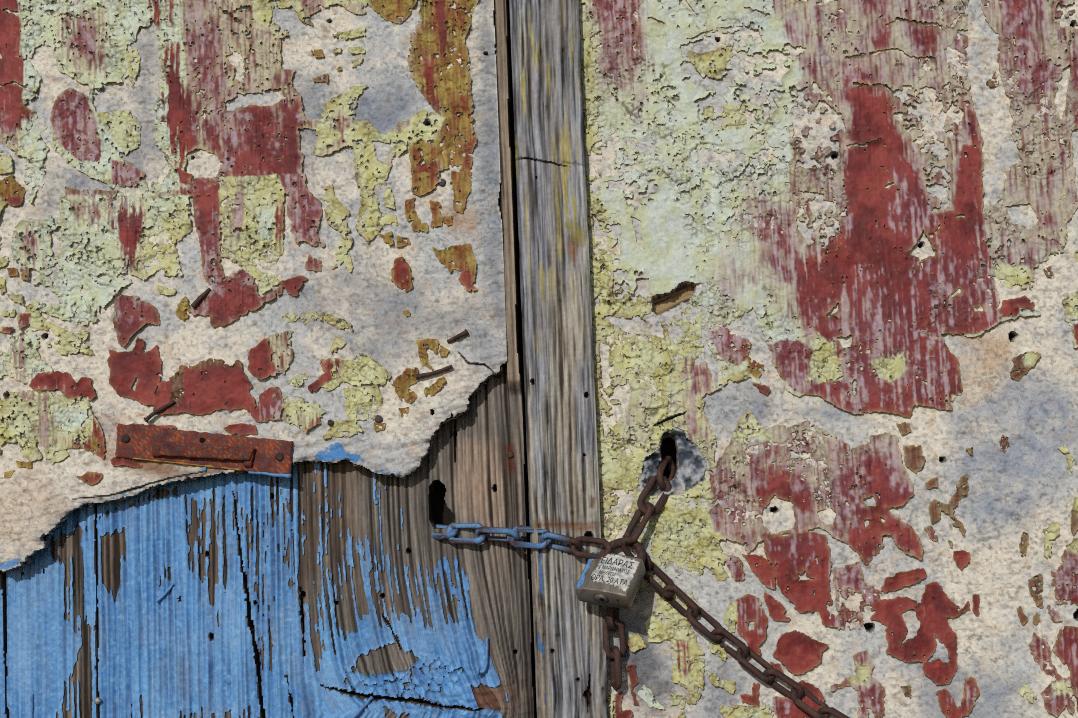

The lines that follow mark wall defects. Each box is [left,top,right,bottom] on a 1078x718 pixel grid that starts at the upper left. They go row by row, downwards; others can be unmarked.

crack [518,157,571,168]
peeling [579,0,1078,718]
peeling [76,471,103,485]
peeling [101,527,126,602]
peeling [185,489,228,626]
peeling [283,455,439,662]
peeling [55,522,93,718]
crack [232,491,306,718]
peeling [351,643,419,678]
crack [382,613,402,650]
crack [320,684,483,712]
peeling [471,673,514,717]